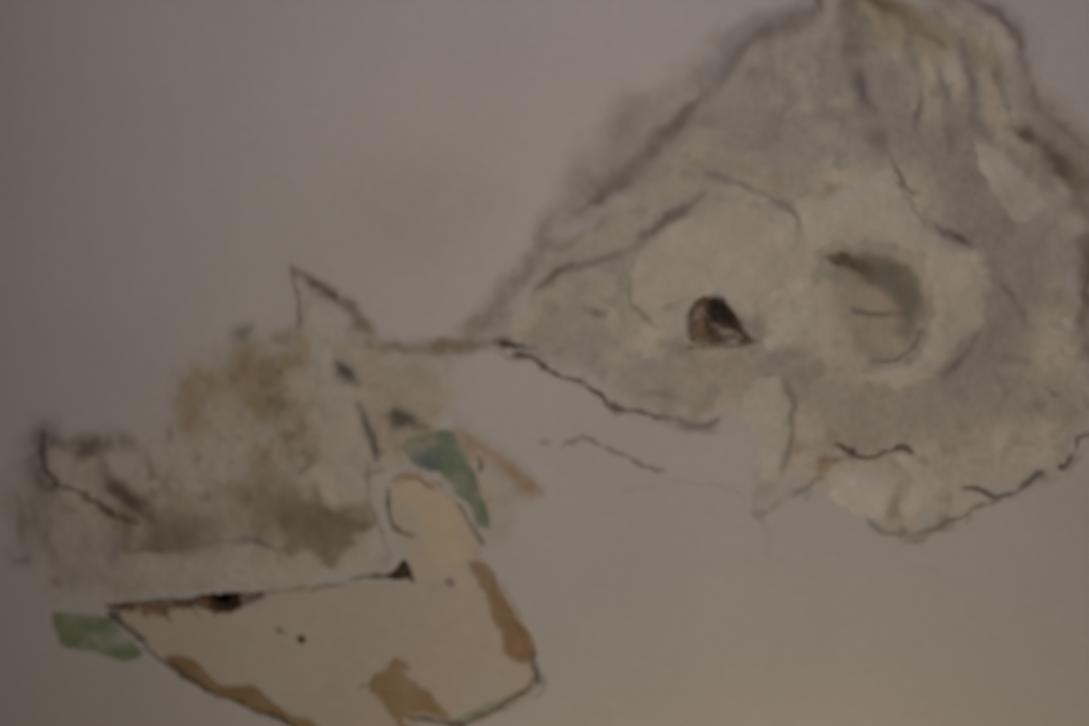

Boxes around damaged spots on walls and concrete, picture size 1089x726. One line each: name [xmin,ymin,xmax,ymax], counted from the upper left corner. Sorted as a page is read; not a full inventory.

flaking render [499,0,1089,546]
water stain [166,351,231,444]
crack [493,333,722,436]
water stain [0,427,66,575]
crack [12,408,172,535]
water stain [134,501,235,561]
flaking render [30,258,545,726]
water stain [232,468,380,572]
crack [755,443,913,559]